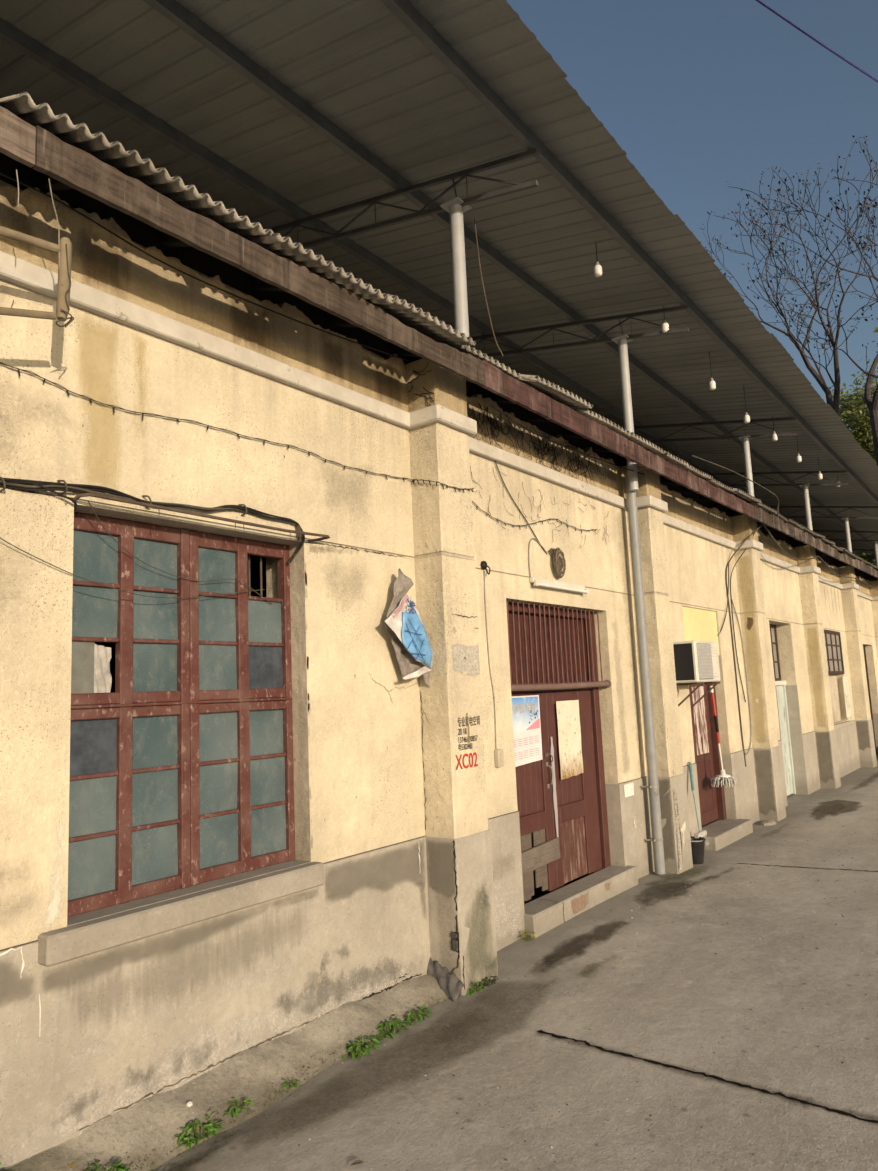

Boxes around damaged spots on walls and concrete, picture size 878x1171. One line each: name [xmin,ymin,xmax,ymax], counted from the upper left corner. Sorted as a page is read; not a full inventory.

water stain [11,967,404,1159]
crack [537,1030,878,1123]